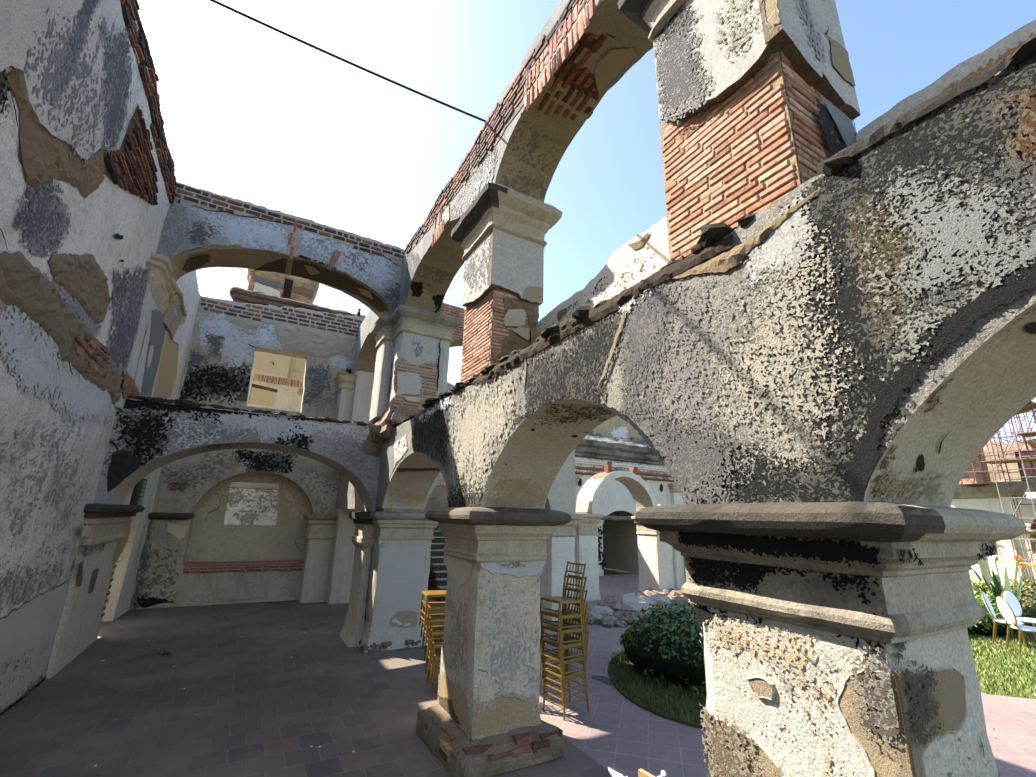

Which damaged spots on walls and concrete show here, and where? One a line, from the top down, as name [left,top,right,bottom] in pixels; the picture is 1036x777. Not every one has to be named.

water stain [0,70,15,128]
water stain [24,0,135,166]
flaking render [103,102,159,206]
flaking render [175,0,615,312]
water stain [652,0,763,131]
flaking render [461,52,1021,384]
water stain [511,56,1036,509]
flaking render [830,37,856,86]
water stain [0,201,493,623]
spalling [703,708,785,777]
spalling [739,675,782,701]
spalling [837,666,967,777]